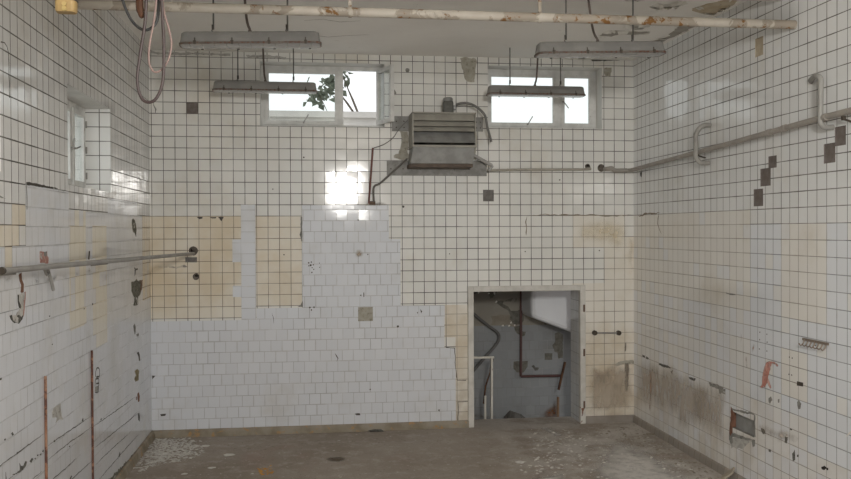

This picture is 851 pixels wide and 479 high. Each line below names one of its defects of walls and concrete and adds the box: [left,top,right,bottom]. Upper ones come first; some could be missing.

peeling [650,0,740,16]
peeling [598,25,693,42]
spalling [10,273,26,324]
spalling [729,407,766,449]